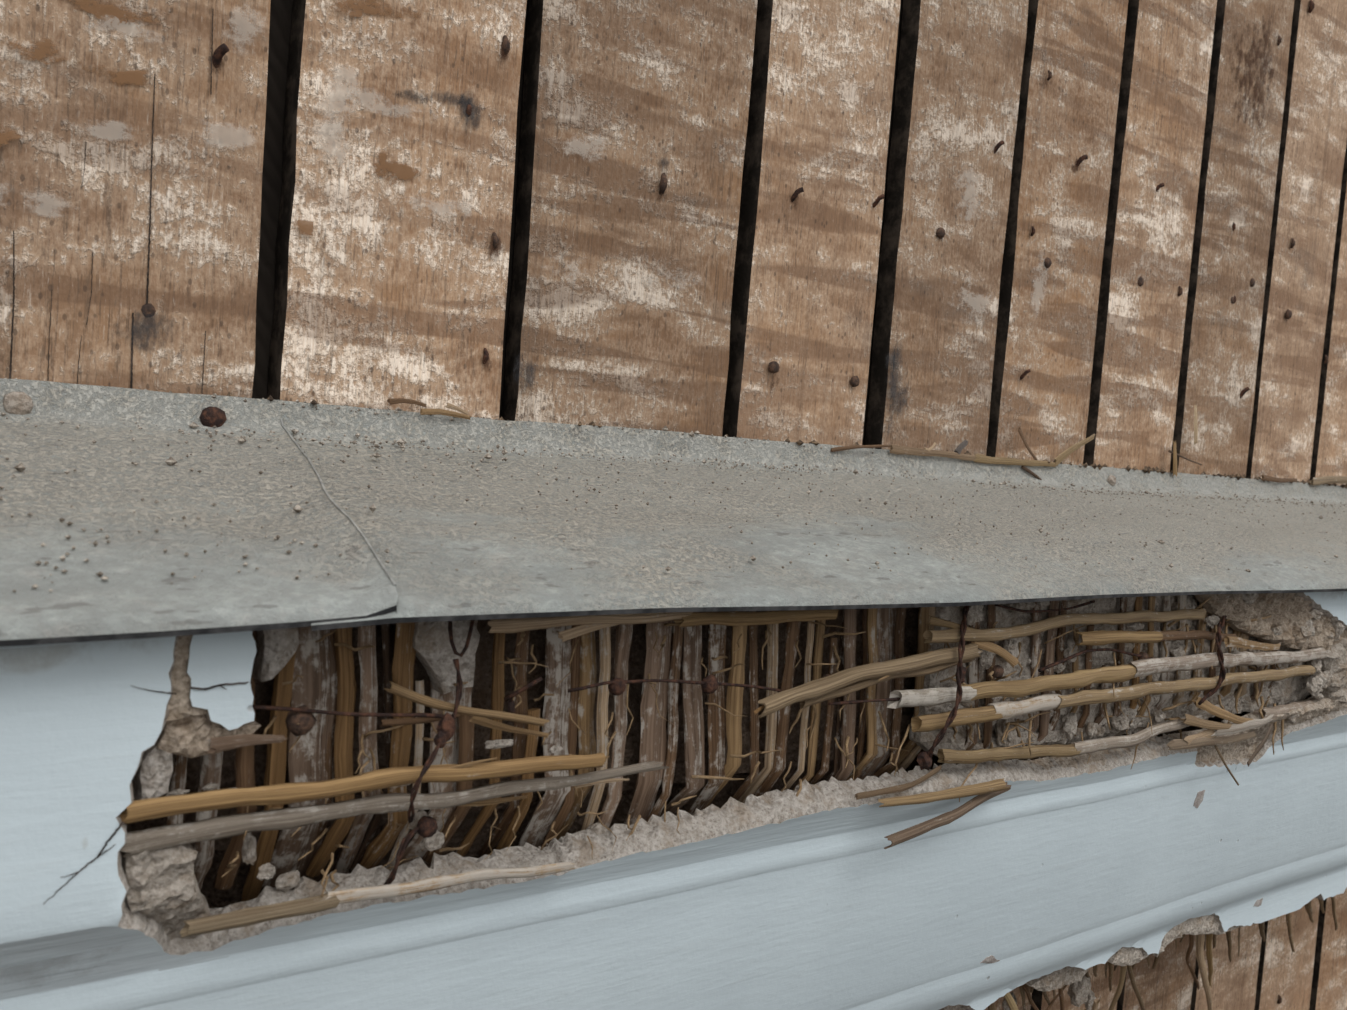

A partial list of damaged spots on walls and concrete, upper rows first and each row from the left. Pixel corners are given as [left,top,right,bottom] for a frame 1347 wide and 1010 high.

spalling [134,627,299,800]
spalling [412,620,480,694]
spalling [484,739,513,749]
spalling [909,593,1347,773]
peeling [1193,790,1205,808]
spalling [408,810,444,851]
spalling [121,843,213,940]
spalling [242,832,301,893]
spalling [1108,915,1239,966]
spalling [1002,967,1096,1010]